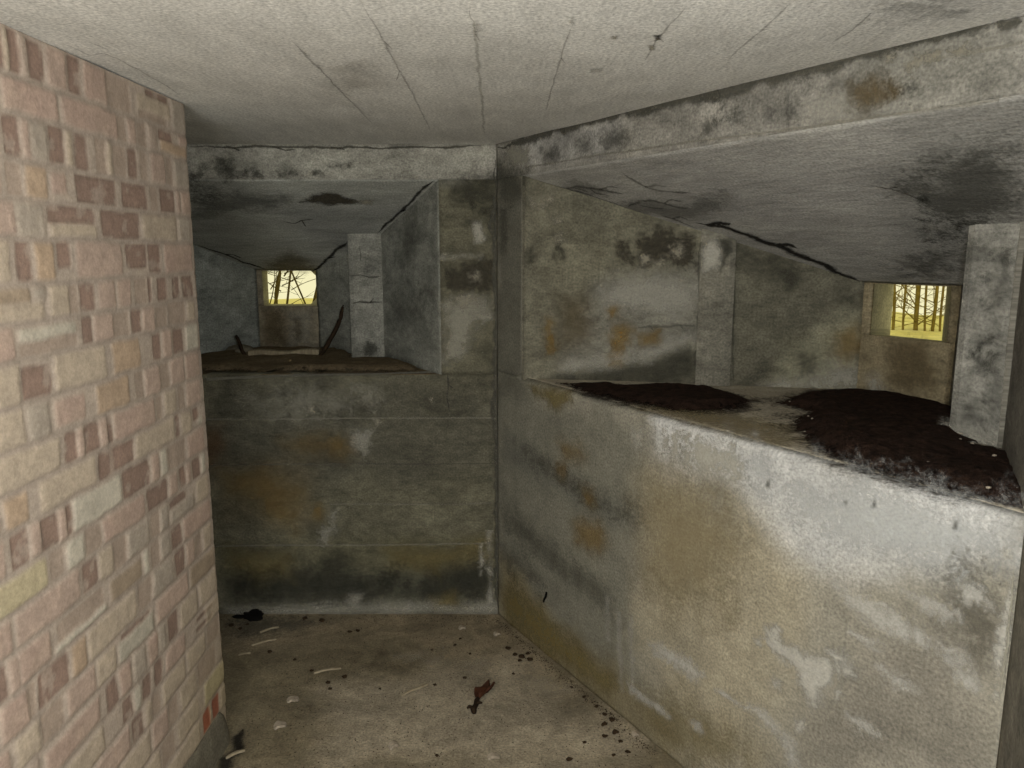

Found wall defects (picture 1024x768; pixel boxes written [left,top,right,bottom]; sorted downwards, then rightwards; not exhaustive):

crack [190,18,1022,605]